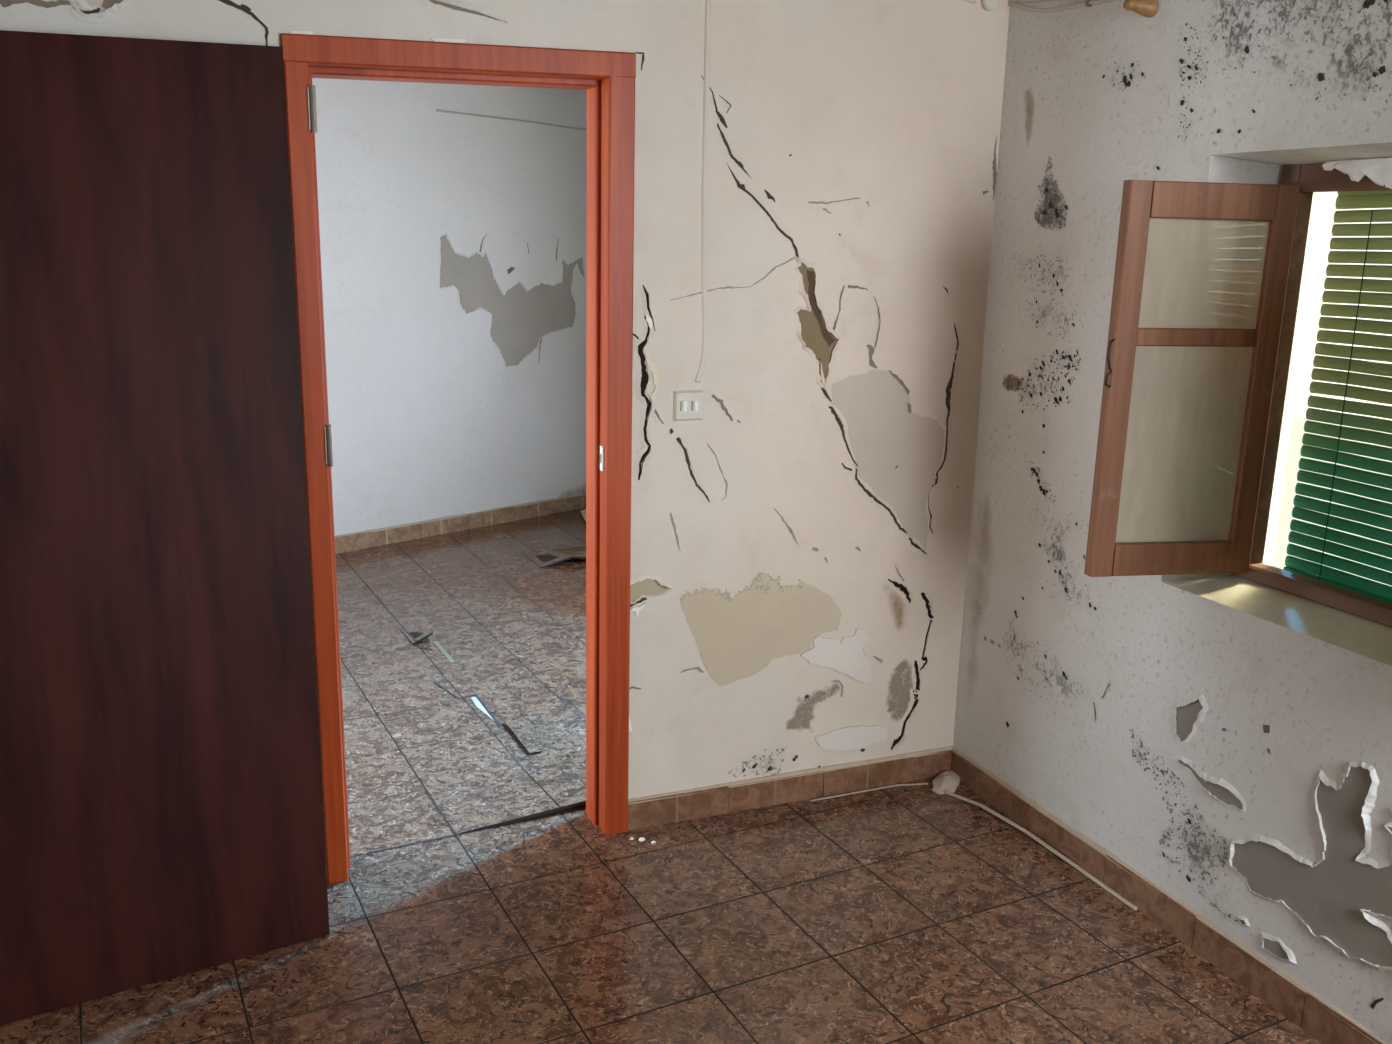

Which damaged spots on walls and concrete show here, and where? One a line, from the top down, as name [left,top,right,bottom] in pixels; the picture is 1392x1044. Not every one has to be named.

crack [0,0,104,24]
crack [219,0,269,46]
damp [1178,0,1392,141]
mould [1034,156,1068,230]
spalling [437,232,585,368]
crack [632,73,870,550]
damp [1003,254,1083,428]
crack [812,284,964,752]
flaking render [630,573,889,752]
mould [1130,729,1238,922]
spalling [1174,693,1246,814]
spalling [1229,761,1392,971]